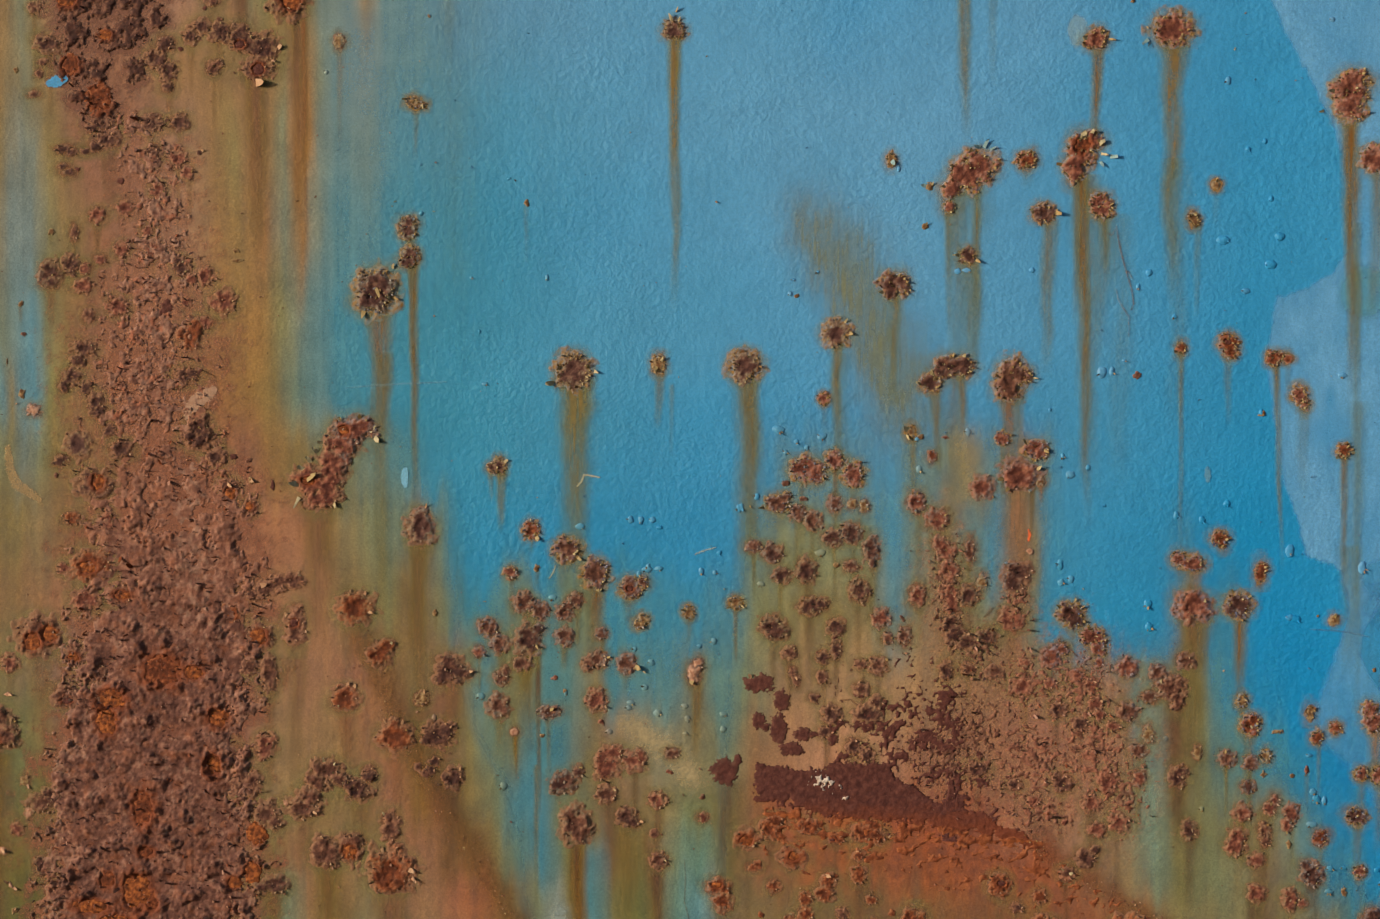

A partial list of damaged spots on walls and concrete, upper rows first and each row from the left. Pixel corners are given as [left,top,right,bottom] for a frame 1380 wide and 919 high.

rust [660,7,691,167]
rust [394,214,423,437]
rust [519,518,542,543]
rust [680,603,696,621]